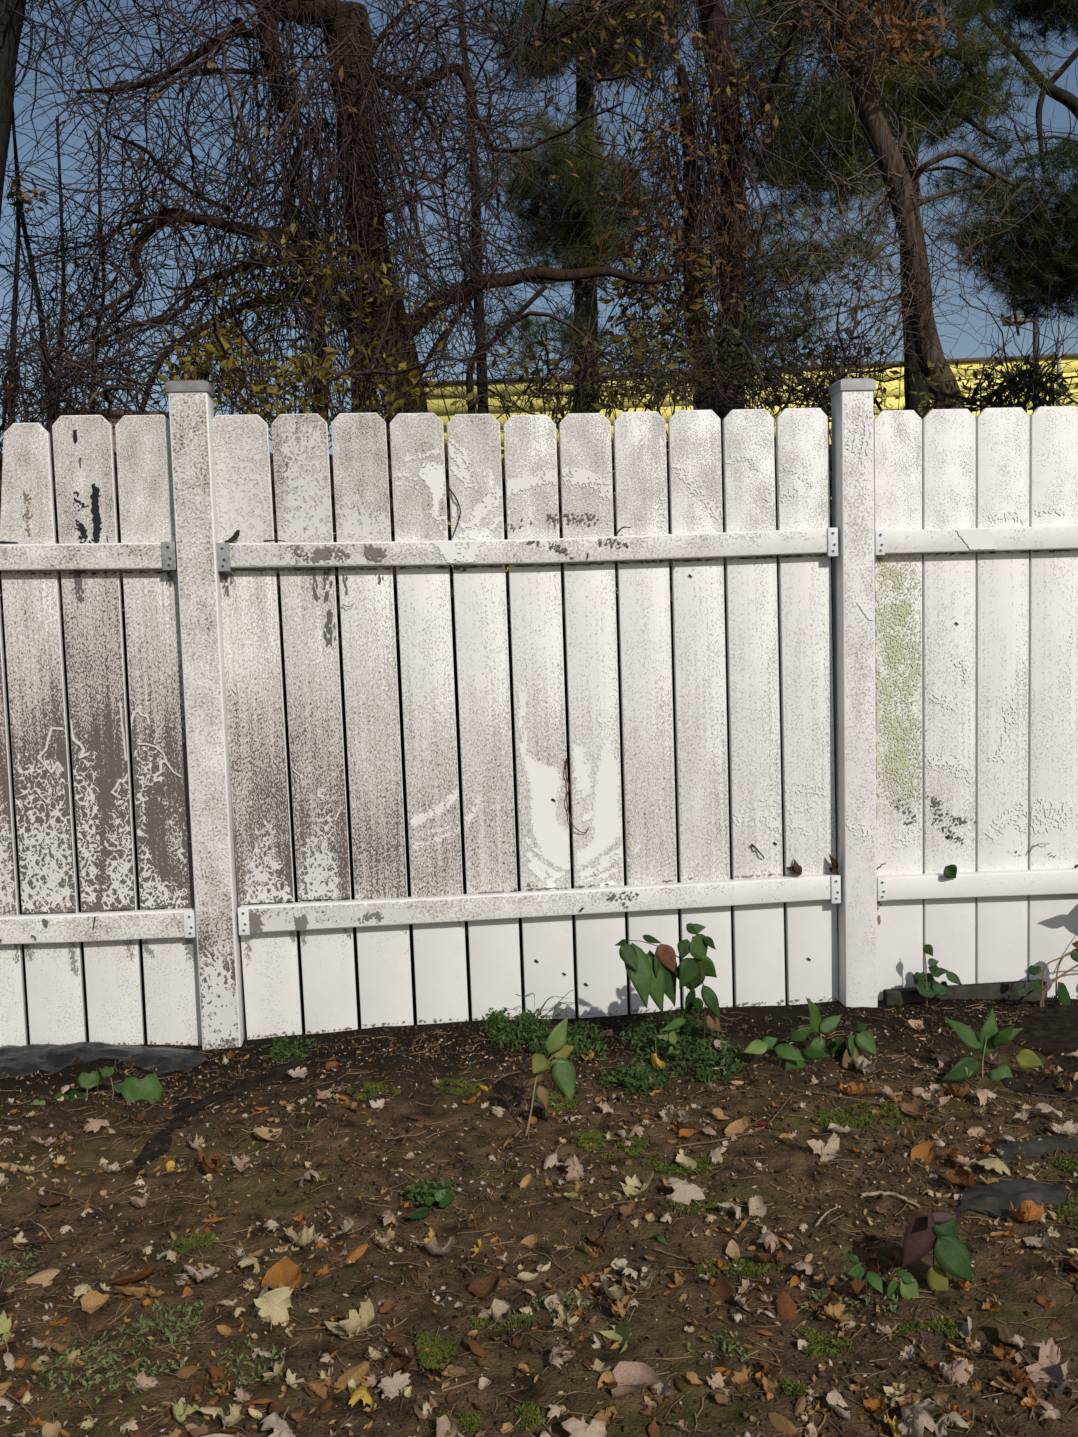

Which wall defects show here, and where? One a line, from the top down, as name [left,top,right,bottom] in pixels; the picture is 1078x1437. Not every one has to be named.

water stain [0,391,1078,1050]